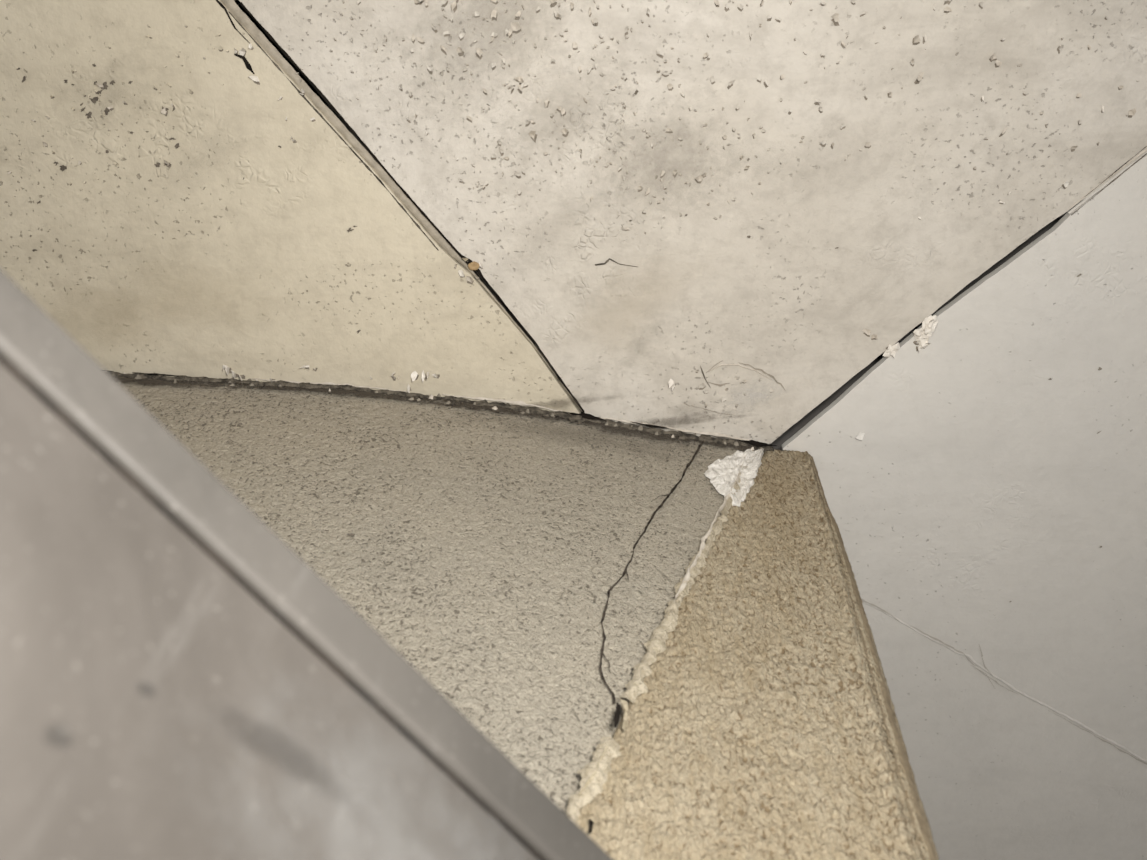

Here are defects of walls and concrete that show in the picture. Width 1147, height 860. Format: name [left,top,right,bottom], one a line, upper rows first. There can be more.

peeling [714,0,782,41]
peeling [794,2,849,69]
peeling [887,59,925,98]
peeling [374,0,722,231]
peeling [712,100,766,150]
peeling [862,315,938,357]
crack [684,360,785,415]
crack [599,440,704,704]
spalling [618,449,764,704]
crack [861,598,1147,765]
spalling [566,736,621,823]